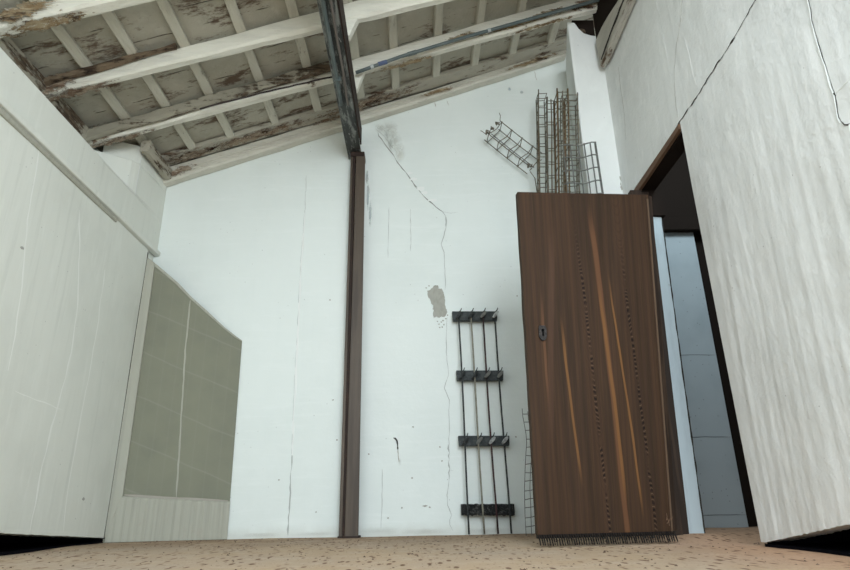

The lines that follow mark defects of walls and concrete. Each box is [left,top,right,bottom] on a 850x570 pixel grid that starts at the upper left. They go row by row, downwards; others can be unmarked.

peeling [0,0,95,38]
crack [674,0,756,127]
peeling [46,79,124,102]
peeling [358,87,453,112]
peeling [90,129,157,148]
peeling [168,108,340,176]
crack [377,130,456,286]
spalling [426,285,448,328]
crack [444,324,454,526]